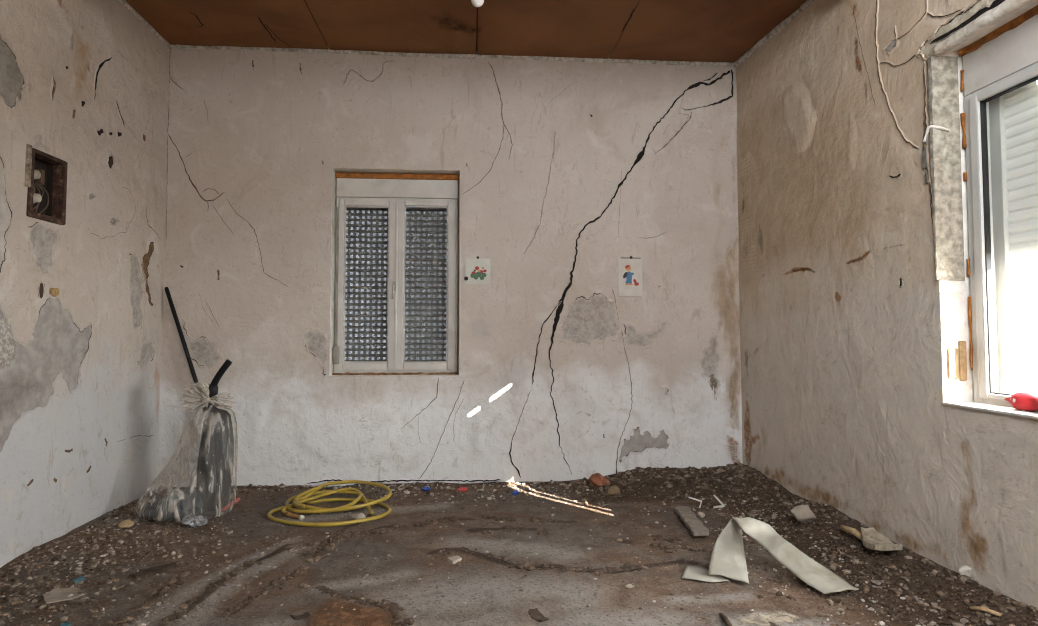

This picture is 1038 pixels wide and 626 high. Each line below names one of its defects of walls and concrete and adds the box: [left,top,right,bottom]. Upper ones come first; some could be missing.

flaking render [0,32,27,113]
flaking render [24,129,56,157]
flaking render [0,150,93,456]
crack [145,112,289,288]
crack [307,60,734,484]
crack [853,0,1005,224]
flaking render [617,424,672,465]
crack [493,555,649,574]